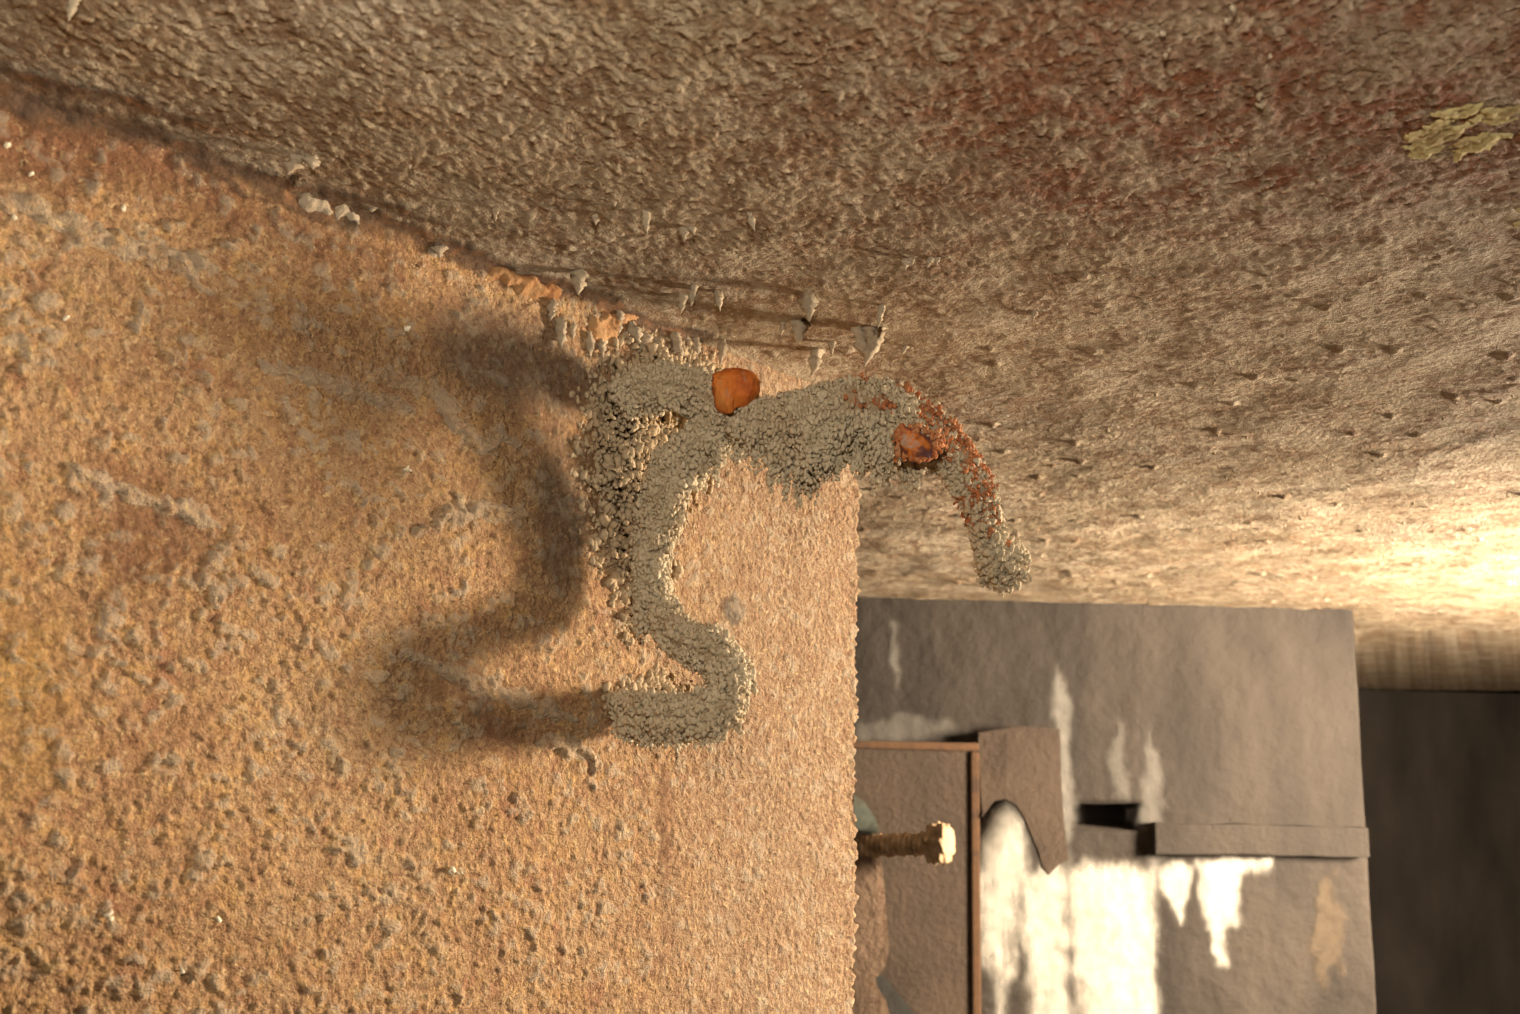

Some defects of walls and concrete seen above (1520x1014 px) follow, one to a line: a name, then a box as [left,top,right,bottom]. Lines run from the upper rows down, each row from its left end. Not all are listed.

damp [443,303,1032,756]
corrosion [843,372,1011,552]
efflorescence [980,807,1271,1014]